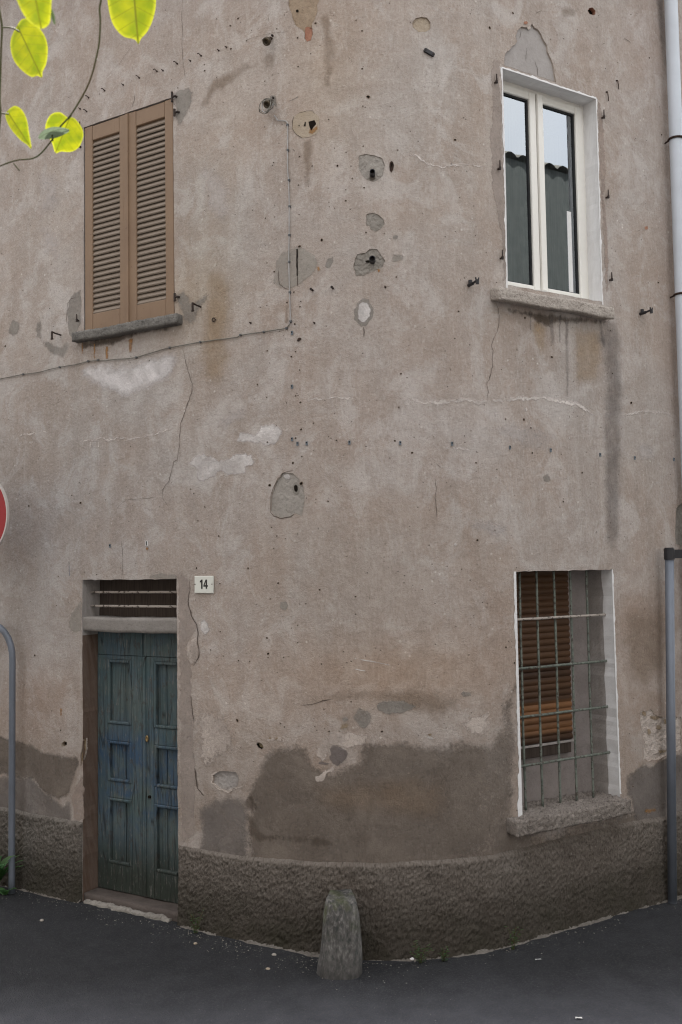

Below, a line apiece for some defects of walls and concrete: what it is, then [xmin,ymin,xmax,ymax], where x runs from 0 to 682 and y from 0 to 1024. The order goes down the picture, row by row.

flaking render [504,21,556,82]
rust [82,333,137,359]
crack [188,582,199,665]
flaking render [640,709,681,761]
leakage [0,737,78,820]
leakage [200,699,682,863]